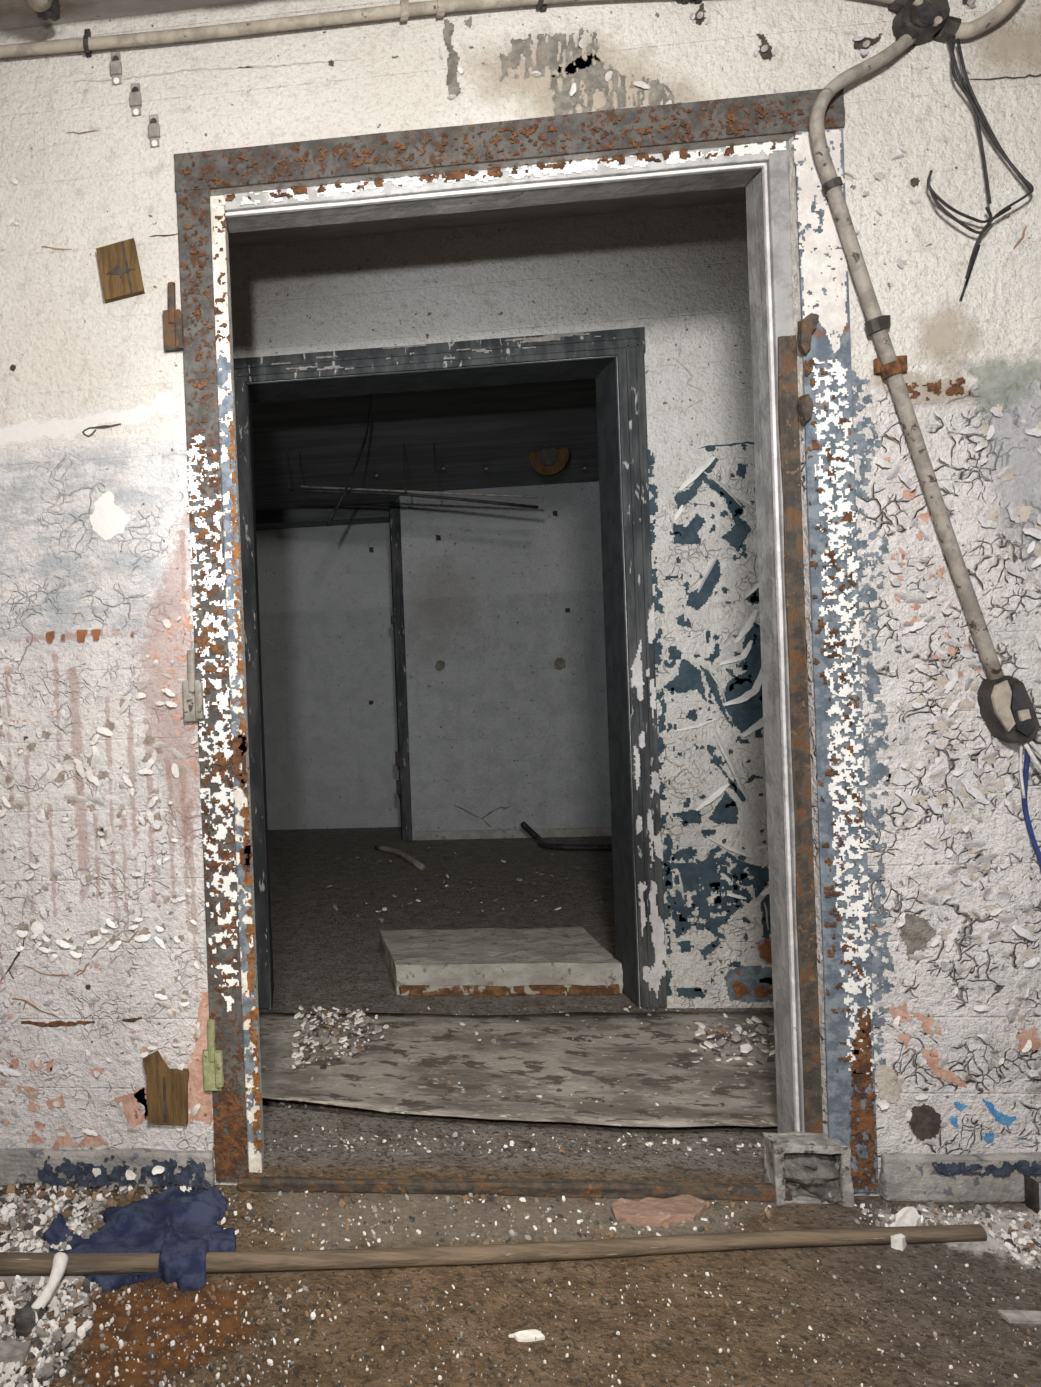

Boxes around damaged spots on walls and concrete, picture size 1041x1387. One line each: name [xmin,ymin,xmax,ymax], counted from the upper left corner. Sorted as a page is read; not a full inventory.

peeling [271,355,354,371]
peeling [212,155,648,229]
peeling [443,332,601,359]
peeling [498,28,682,116]
corrosion [803,358,828,387]
peeling [0,248,263,1190]
peeling [630,444,773,1004]
corrosion [806,394,860,726]
peeling [666,129,1041,1177]
corrosion [818,734,878,1190]